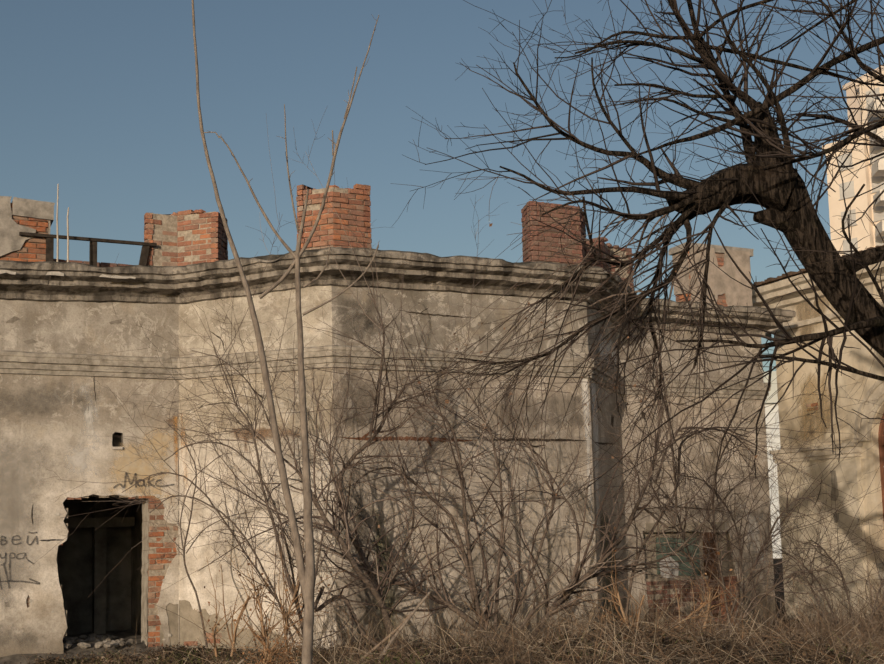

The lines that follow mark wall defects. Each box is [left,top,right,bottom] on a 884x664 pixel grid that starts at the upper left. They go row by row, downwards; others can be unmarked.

flaking render [55,487,285,651]